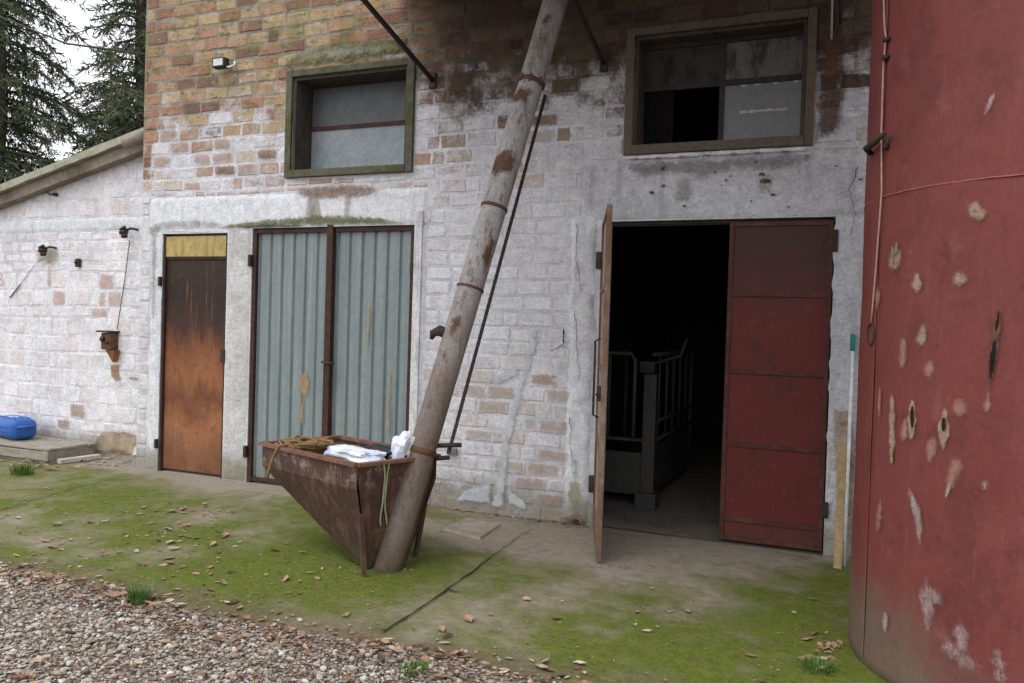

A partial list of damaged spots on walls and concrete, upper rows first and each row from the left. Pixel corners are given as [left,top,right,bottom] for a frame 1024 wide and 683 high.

peeling [969,202,985,219]
rust [300,373,309,423]
peeling [878,389,916,463]
peeling [927,401,965,461]
peeling [945,461,959,496]